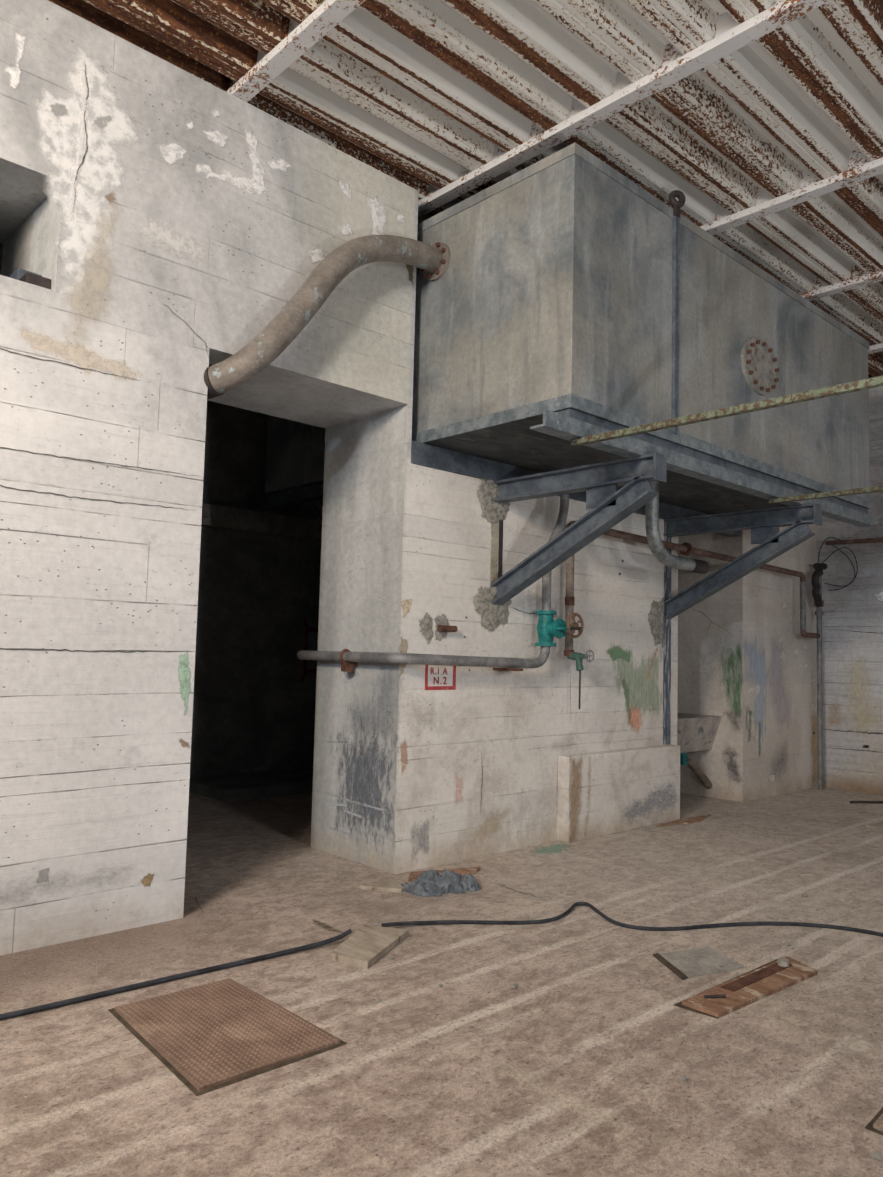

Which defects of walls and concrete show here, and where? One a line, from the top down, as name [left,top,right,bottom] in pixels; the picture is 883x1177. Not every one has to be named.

water stain [36,48,138,295]